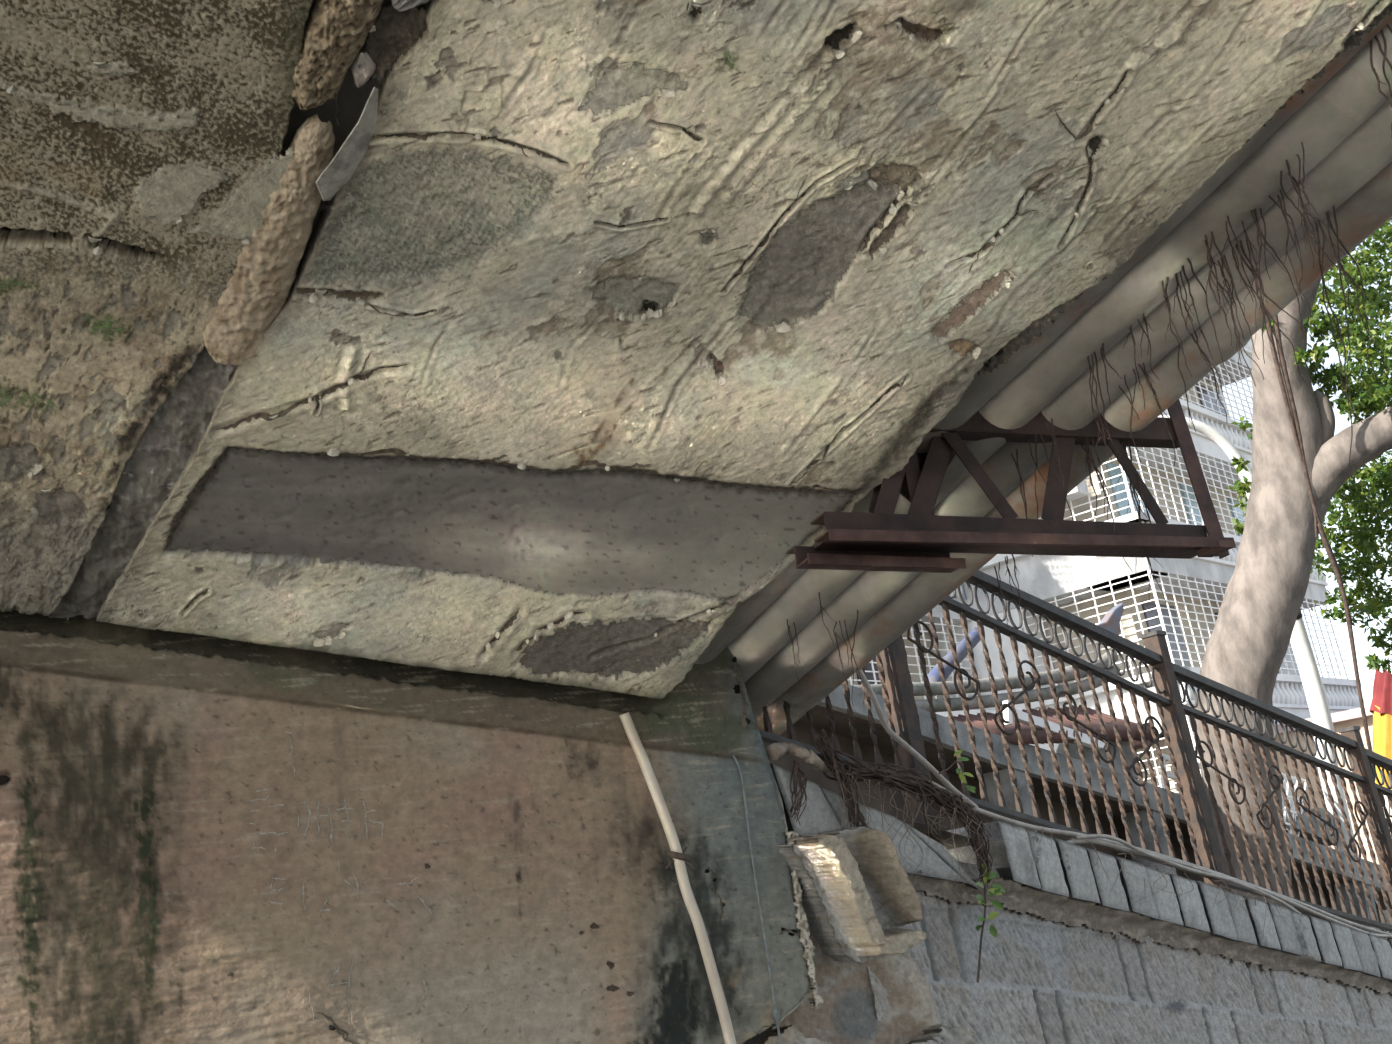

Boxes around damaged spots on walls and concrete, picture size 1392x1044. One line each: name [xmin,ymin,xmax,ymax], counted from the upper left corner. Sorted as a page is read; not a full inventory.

peeling [578,61,688,116]
spalling [824,23,862,59]
crack [1054,69,1129,238]
crack [727,161,850,284]
peeling [740,163,921,333]
crack [860,188,908,251]
crack [947,174,1049,272]
peeling [931,271,1017,360]
crack [164,353,906,551]
peeling [519,617,713,680]
leakage [0,680,172,1044]
leakage [637,840,742,1044]